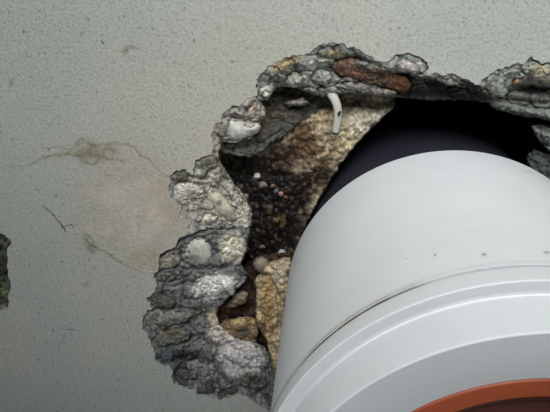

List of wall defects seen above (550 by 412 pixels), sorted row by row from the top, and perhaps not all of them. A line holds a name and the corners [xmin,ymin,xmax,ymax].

spalling [0,233,11,310]
spalling [142,42,550,410]